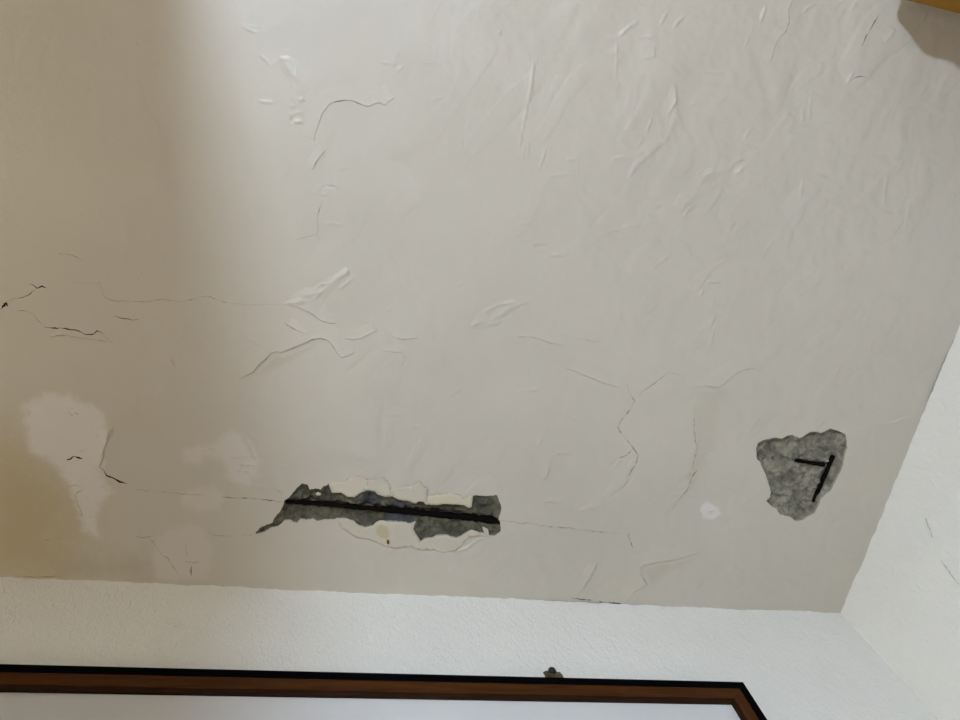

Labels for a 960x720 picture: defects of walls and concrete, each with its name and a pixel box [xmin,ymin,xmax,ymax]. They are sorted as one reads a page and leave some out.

crack [0,253,278,342]
crack [67,450,199,495]
leakage [0,343,278,586]
spalling [256,476,501,553]
crack [611,372,678,491]
spalling [756,429,847,521]